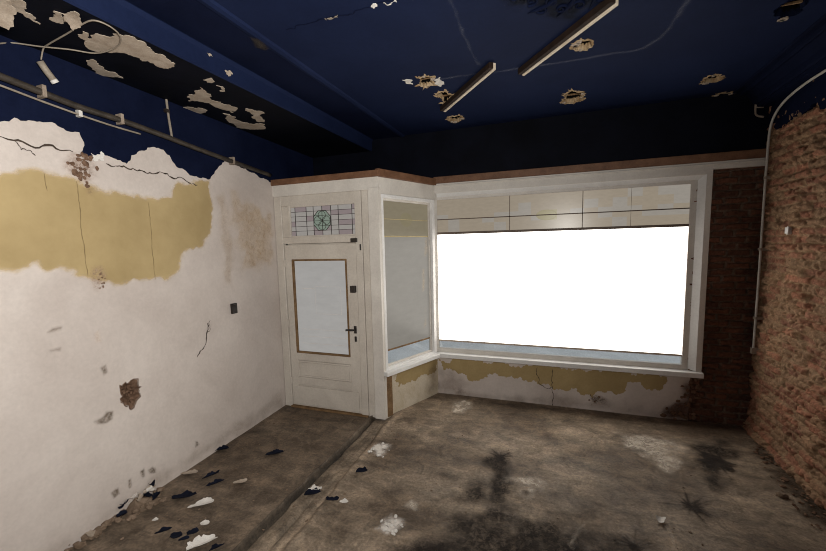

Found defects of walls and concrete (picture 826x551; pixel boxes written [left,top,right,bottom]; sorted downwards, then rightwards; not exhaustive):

peeling [0,0,40,30]
peeling [286,0,398,30]
peeling [49,11,175,78]
peeling [183,78,266,130]
crack [0,136,73,189]
spalling [66,151,105,188]
crack [106,163,197,186]
spalling [119,378,142,410]
peeling [395,359,667,403]
damp [396,449,654,551]